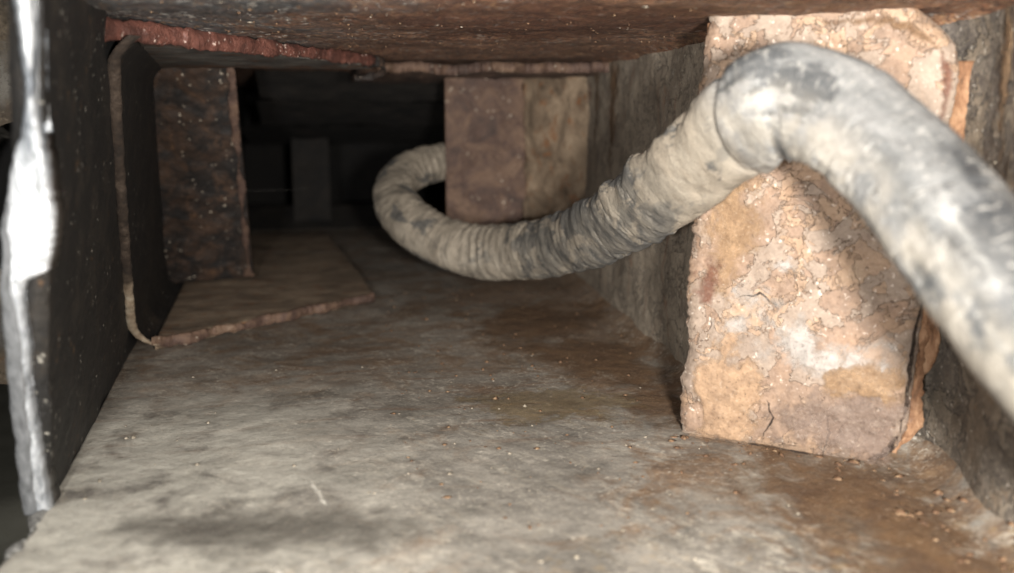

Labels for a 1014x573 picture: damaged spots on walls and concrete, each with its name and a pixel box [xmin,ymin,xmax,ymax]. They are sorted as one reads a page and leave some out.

corrosion [839,17,930,41]
corrosion [942,58,974,139]
corrosion [999,7,1012,133]